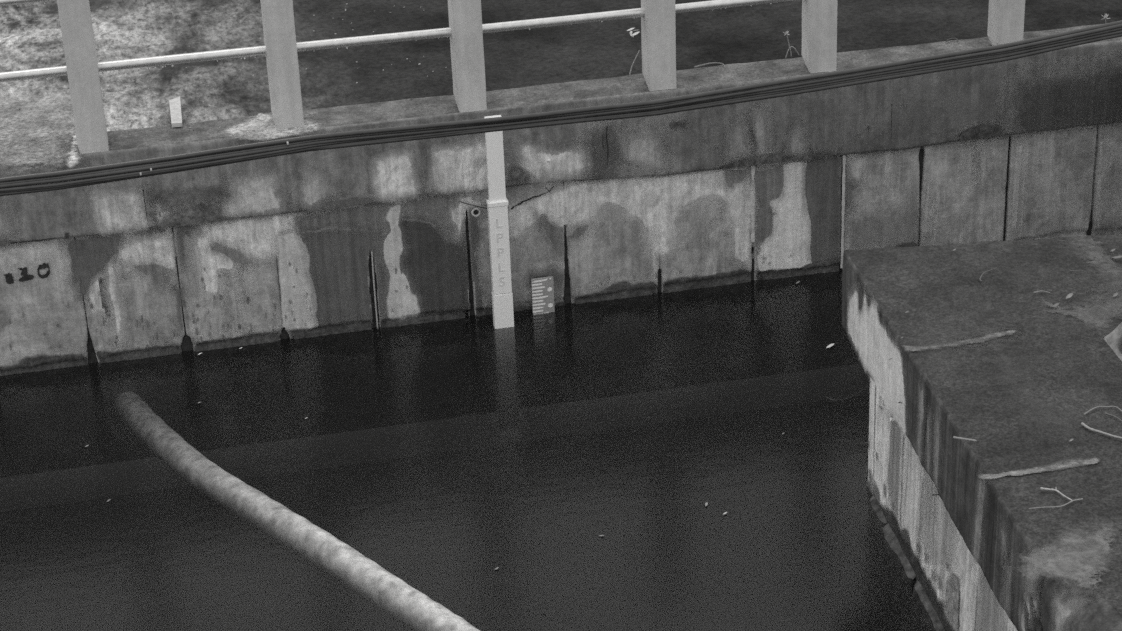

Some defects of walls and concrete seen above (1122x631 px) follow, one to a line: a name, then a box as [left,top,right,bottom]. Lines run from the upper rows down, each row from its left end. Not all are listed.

water stain [0,143,488,337]
water stain [509,126,784,288]
water stain [735,113,765,152]
water stain [806,156,929,263]
water stain [952,479,1011,631]
water stain [1021,560,1038,631]